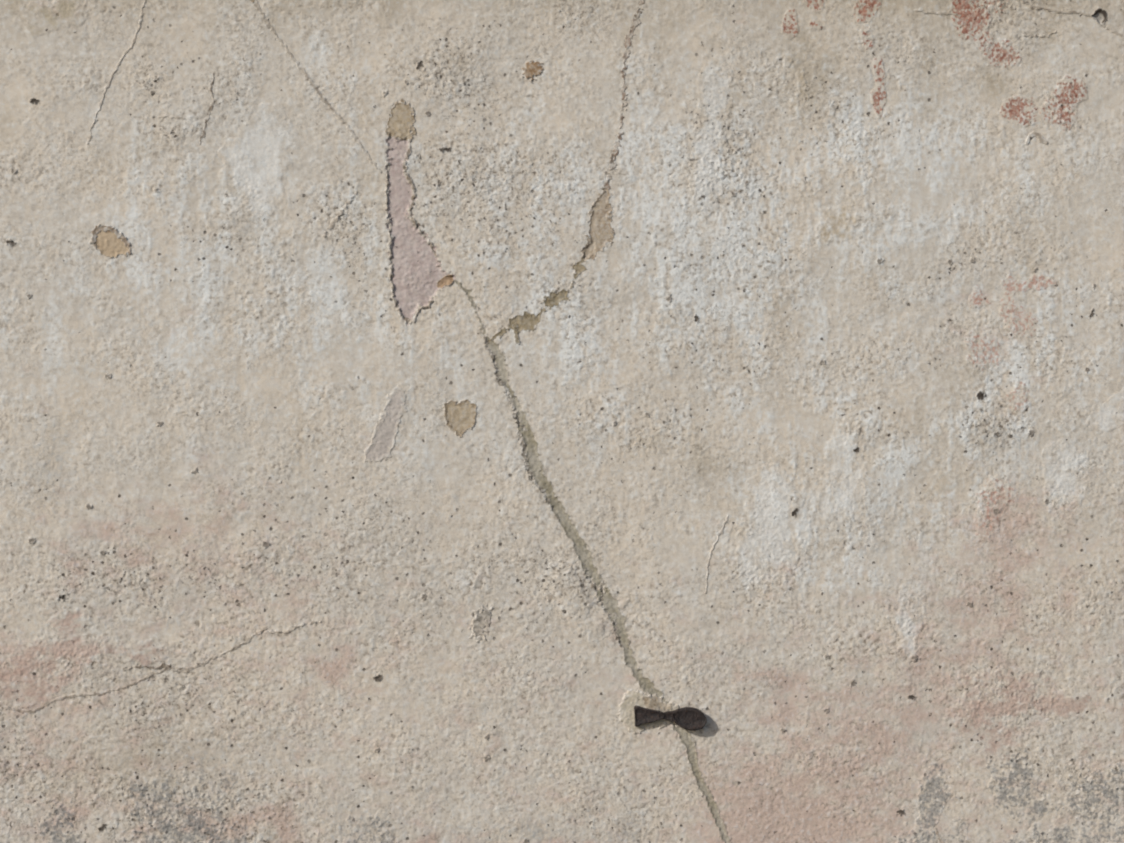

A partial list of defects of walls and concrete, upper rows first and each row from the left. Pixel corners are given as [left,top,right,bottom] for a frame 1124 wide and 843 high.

crack [86,0,146,145]
crack [158,71,215,145]
crack [253,0,382,174]
crack [603,0,645,193]
corrosion [781,0,826,41]
corrosion [852,0,887,119]
corrosion [949,0,1022,68]
corrosion [999,74,1089,131]
peeling [384,136,456,326]
spalling [580,187,615,261]
crack [454,242,732,843]
crack [0,621,322,713]